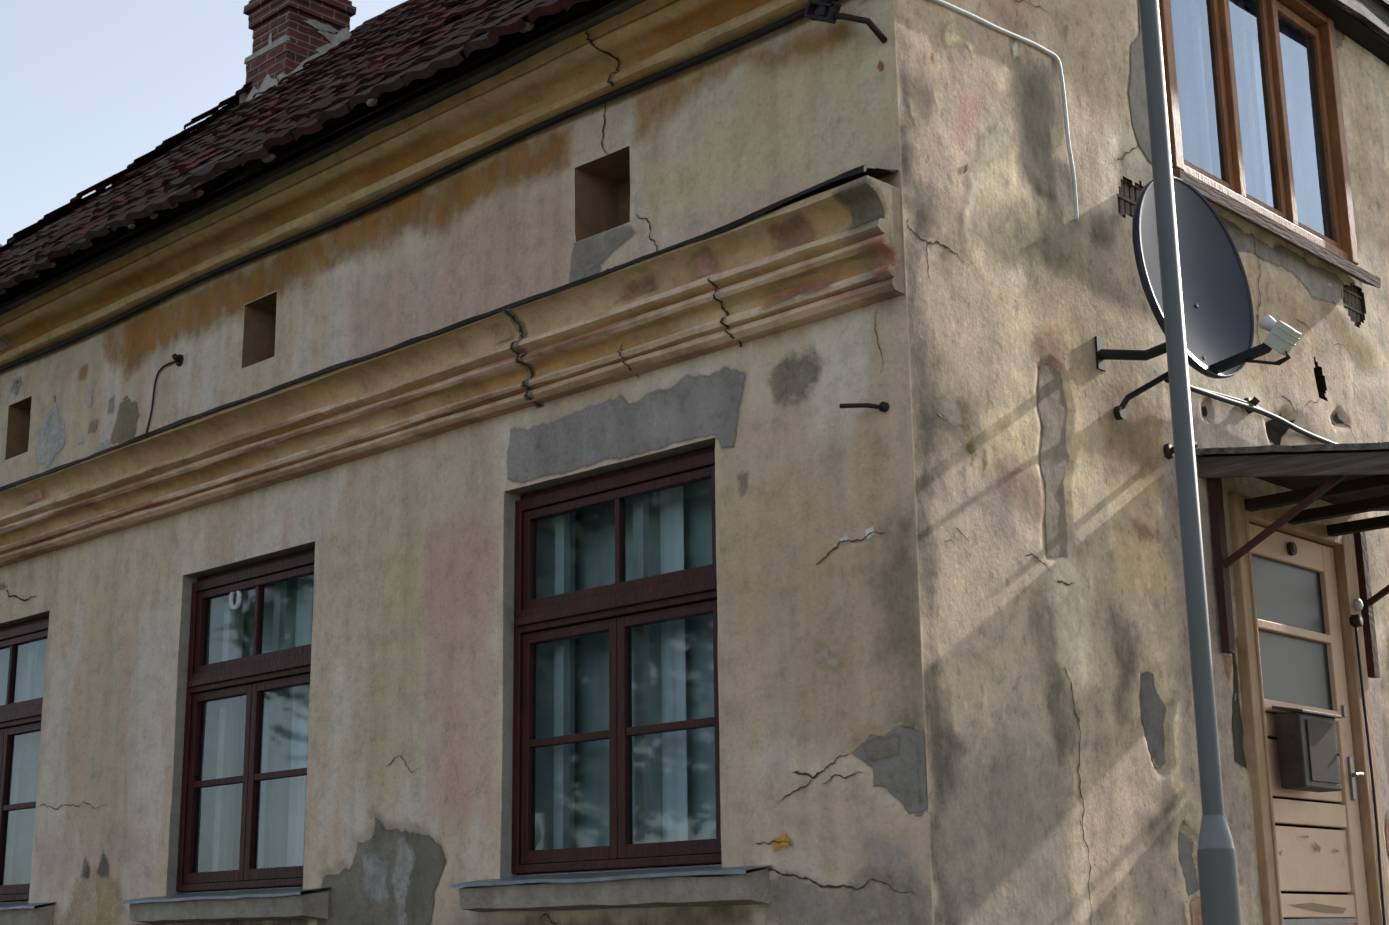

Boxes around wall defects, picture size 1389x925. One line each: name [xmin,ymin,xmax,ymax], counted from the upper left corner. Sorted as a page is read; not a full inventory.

crack [636,214,657,251]
crack [502,308,544,408]
crack [707,277,742,347]
flaking render [1334,283,1363,327]
crack [779,754,863,803]
flaking render [852,723,932,816]
crack [1064,667,1092,922]
flaking render [1140,671,1202,925]
flaking render [317,818,446,925]
crack [755,840,914,893]